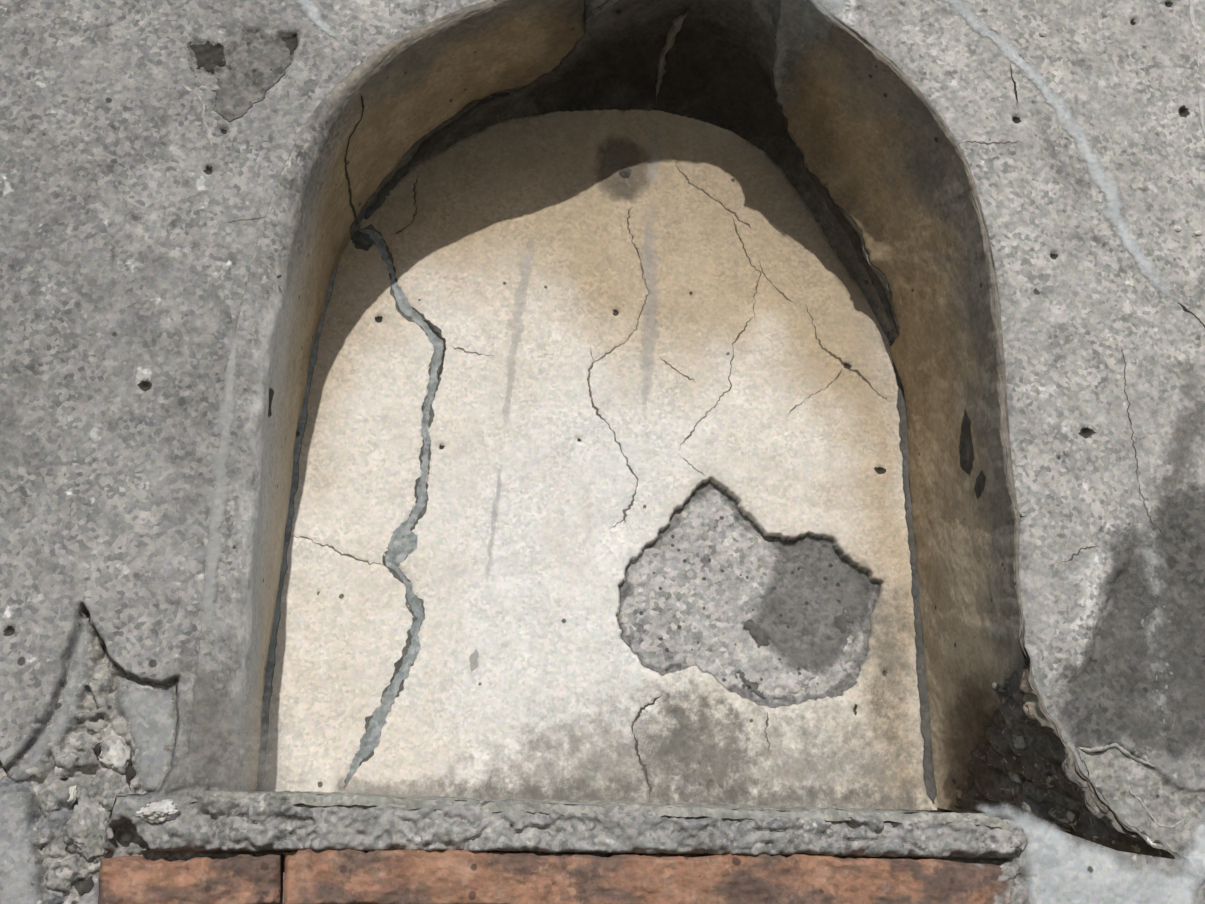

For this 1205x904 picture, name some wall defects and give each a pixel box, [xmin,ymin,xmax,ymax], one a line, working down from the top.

spalling [178,26,298,146]
spalling [0,609,178,904]
crack [257,94,495,790]
crack [587,204,650,528]
spalling [617,480,881,708]
crack [663,166,937,804]
spalling [955,620,1205,860]
damp [1060,488,1205,755]